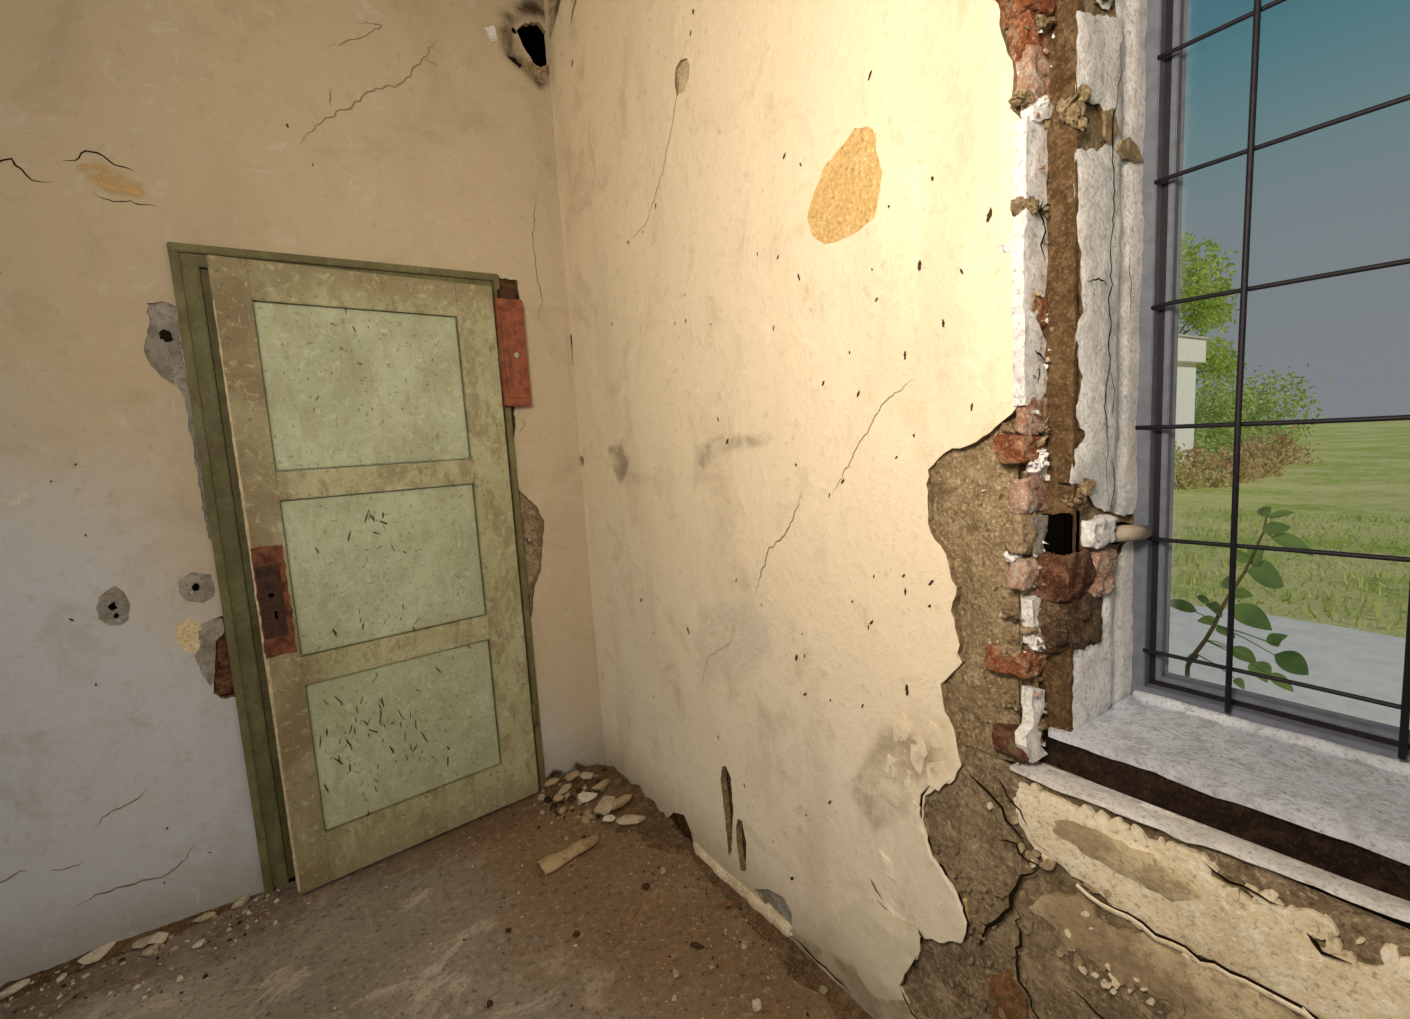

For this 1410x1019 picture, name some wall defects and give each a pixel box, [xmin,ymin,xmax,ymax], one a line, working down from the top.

crack [300,40,438,144]
spalling [485,24,550,85]
crack [1089,28,1132,511]
flaking render [519,492,543,612]
crack [701,380,911,689]
peeling [886,0,1410,1019]
flaking render [214,616,235,697]
crack [870,879,924,1019]
crack [915,774,1041,1019]
crack [1076,883,1320,1019]
crack [1205,863,1281,906]
crack [1307,933,1352,964]